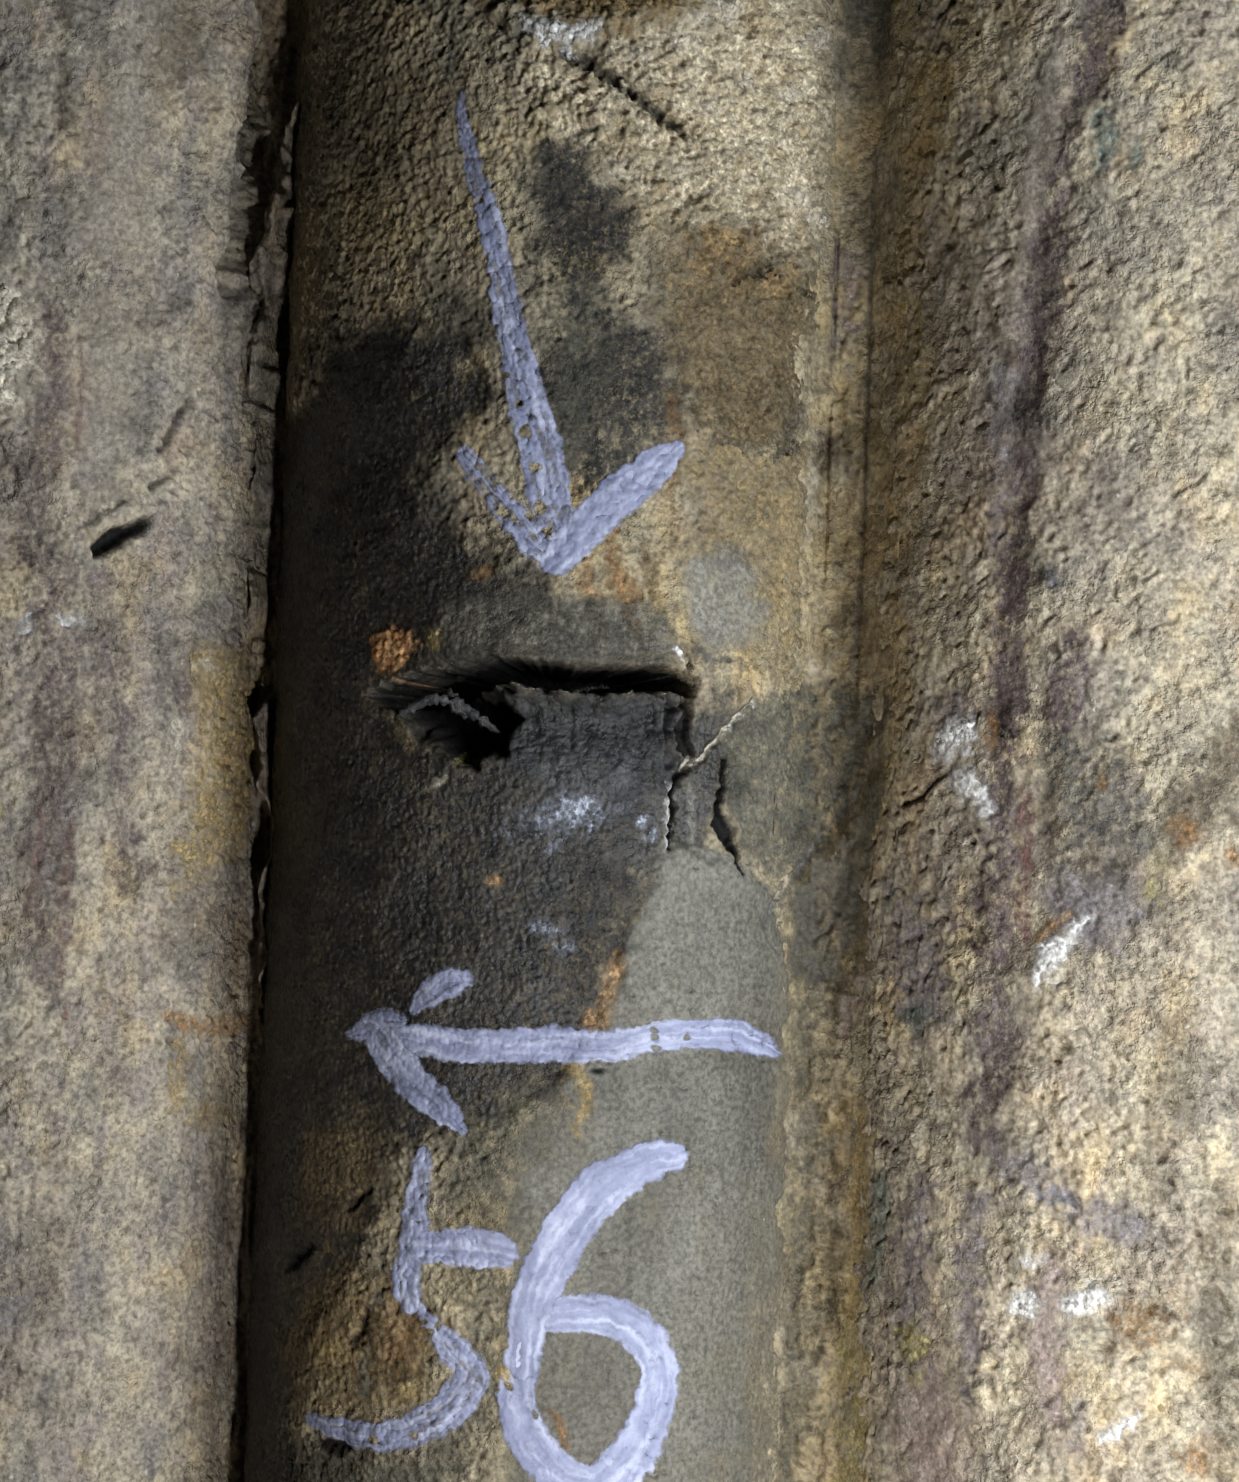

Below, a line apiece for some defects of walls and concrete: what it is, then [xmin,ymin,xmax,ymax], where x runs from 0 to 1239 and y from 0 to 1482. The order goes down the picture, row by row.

crack [558,50,685,137]
corrosion [369,626,441,671]
crack [394,595,755,875]
crack [762,703,888,926]
leakage [884,0,1239,1242]
peeling [439,684,881,1482]
leakage [1196,1180,1239,1482]